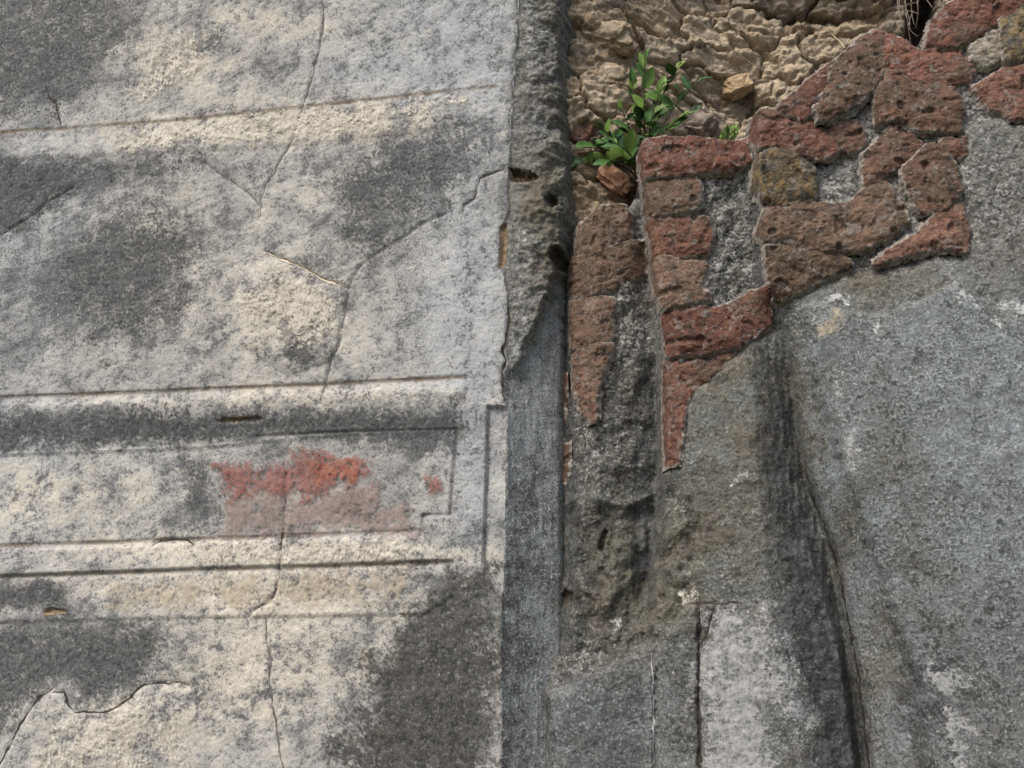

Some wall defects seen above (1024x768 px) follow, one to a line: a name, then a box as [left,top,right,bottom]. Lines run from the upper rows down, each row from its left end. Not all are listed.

leakage [36,197,212,369]
leakage [0,89,493,274]
crack [205,0,324,215]
crack [266,169,503,400]
crack [0,681,190,763]
leakage [0,394,470,519]
crack [252,485,287,768]
peeling [208,445,416,540]
leakage [201,537,530,768]
crack [685,601,742,768]
leakage [678,354,872,768]
crack [806,474,870,768]